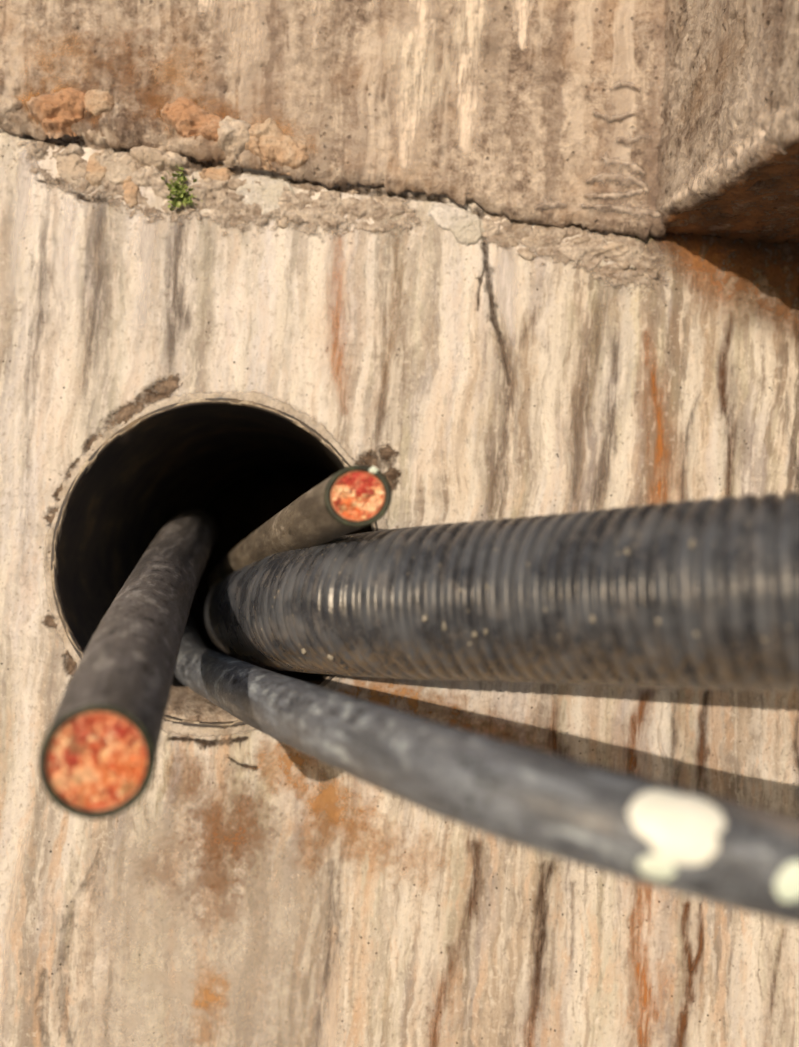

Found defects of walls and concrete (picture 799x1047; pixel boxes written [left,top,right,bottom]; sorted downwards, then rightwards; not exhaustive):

crack [4,131,86,147]
crack [190,159,243,180]
spalling [11,135,675,294]
crack [329,188,446,204]
crack [477,216,510,385]
spalling [44,373,182,526]
spalling [352,444,401,491]
rust [651,373,665,503]
spalling [41,615,57,628]
rust [259,744,363,830]
rust [202,795,259,861]